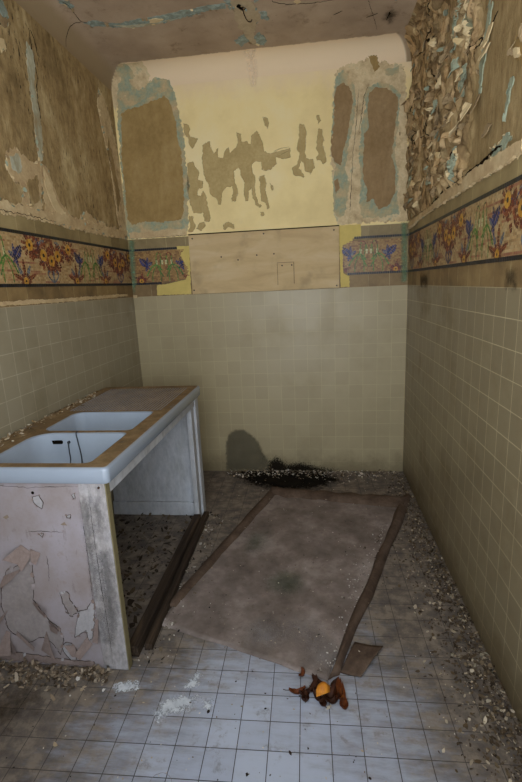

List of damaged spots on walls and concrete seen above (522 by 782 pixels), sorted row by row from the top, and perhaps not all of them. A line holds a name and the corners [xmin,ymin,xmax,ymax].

spalling [0,0,522,295]
peeling [0,294,128,306]
water stain [226,430,269,471]